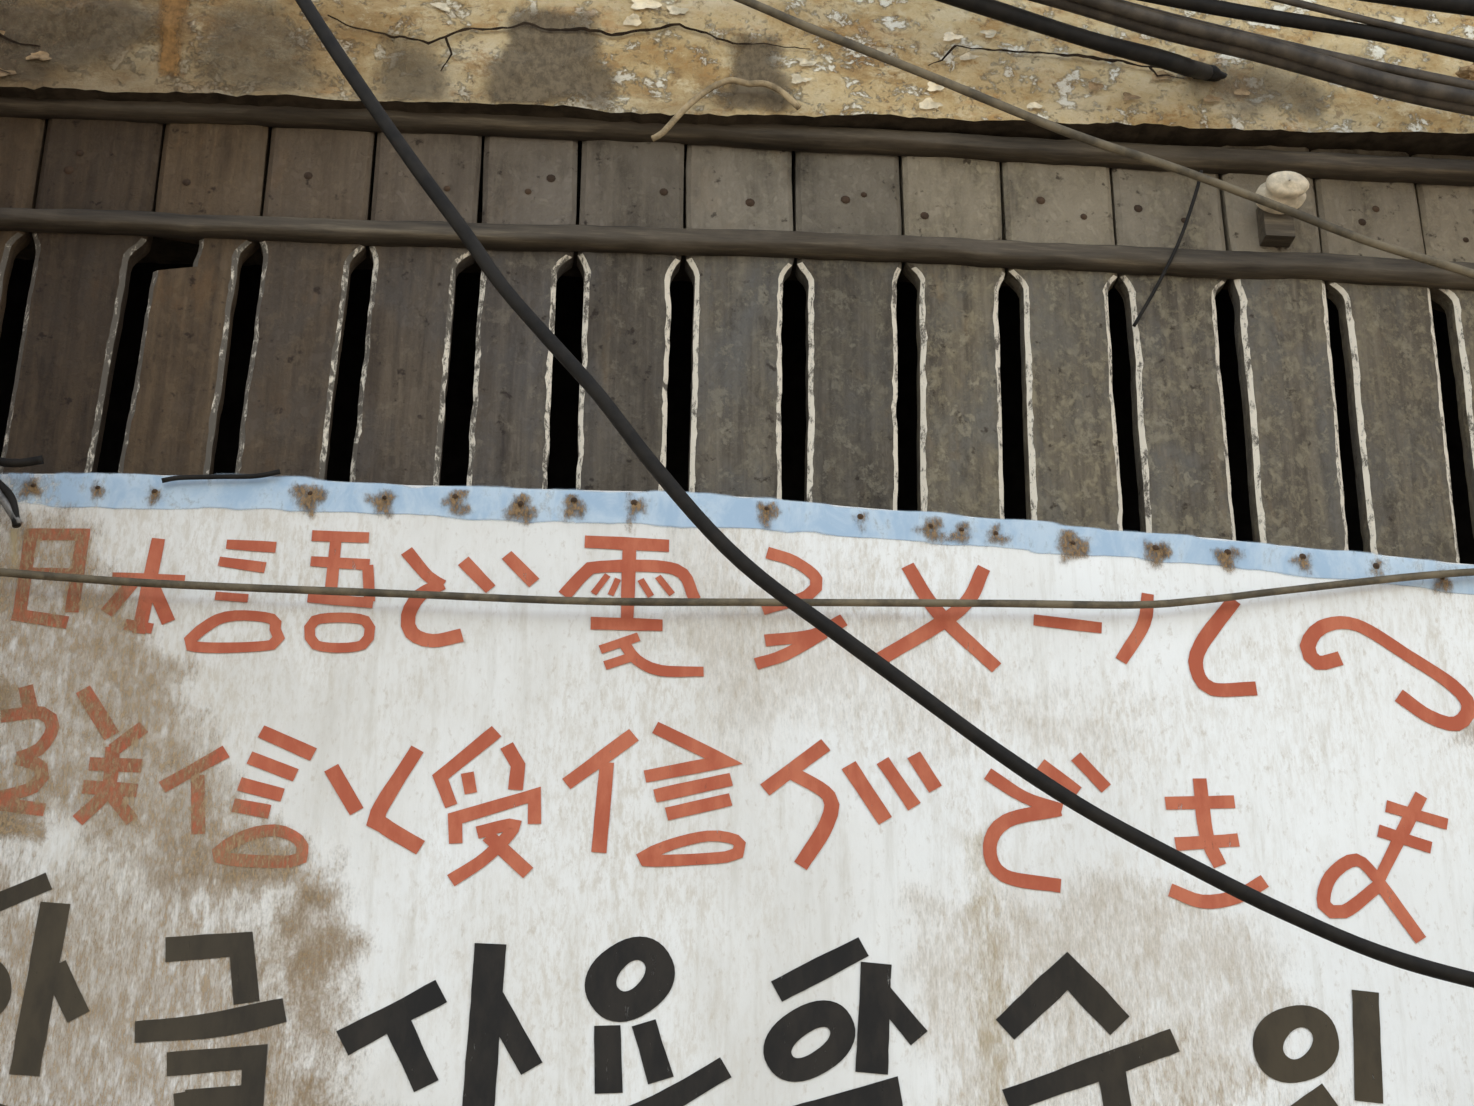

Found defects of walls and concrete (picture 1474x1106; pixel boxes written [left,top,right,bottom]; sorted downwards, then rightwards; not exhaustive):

peeling [623,0,689,26]
peeling [0,51,52,77]
rust [158,0,189,74]
damp [489,10,613,107]
crack [327,15,809,71]
damp [717,35,789,111]
peeling [791,58,817,84]
peeling [943,30,996,60]
peeling [919,81,944,109]